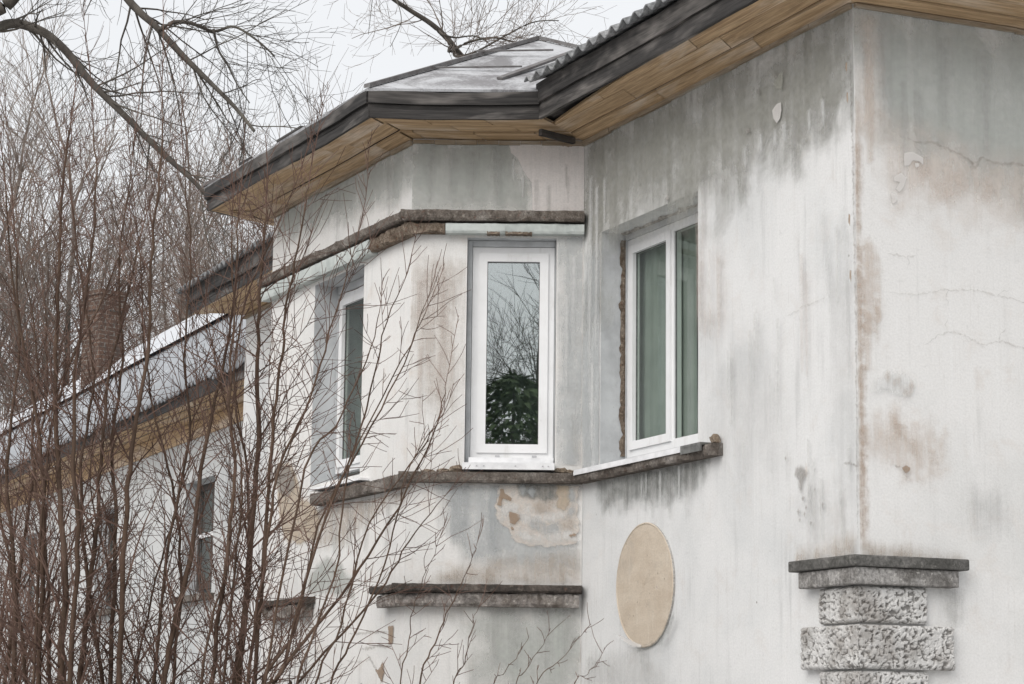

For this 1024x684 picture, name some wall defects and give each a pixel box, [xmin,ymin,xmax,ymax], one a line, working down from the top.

peeling [772,102,781,123]
leakage [880,17,1024,174]
leakage [278,144,527,234]
leakage [558,12,869,468]
spalling [618,203,698,457]
spalling [494,484,580,547]
leakage [601,460,704,503]